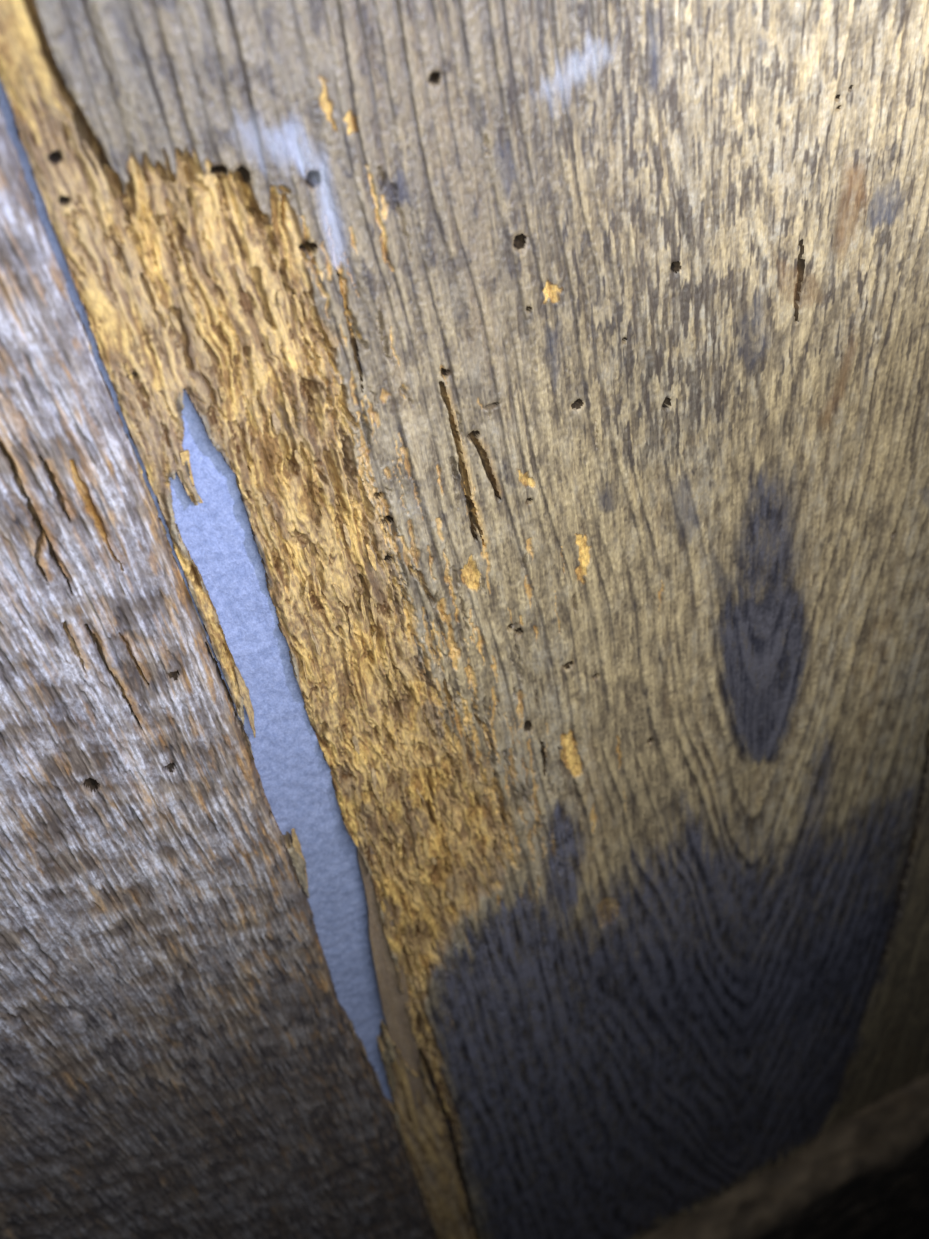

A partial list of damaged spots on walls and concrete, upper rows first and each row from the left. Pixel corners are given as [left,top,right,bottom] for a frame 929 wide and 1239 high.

peeling [123,243,134,278]
peeling [229,231,247,293]
peeling [169,312,182,334]
peeling [277,290,304,323]
peeling [252,392,297,435]
peeling [517,468,536,489]
peeling [343,523,377,571]
peeling [461,554,483,593]
peeling [333,584,377,649]
crack [205,641,241,722]